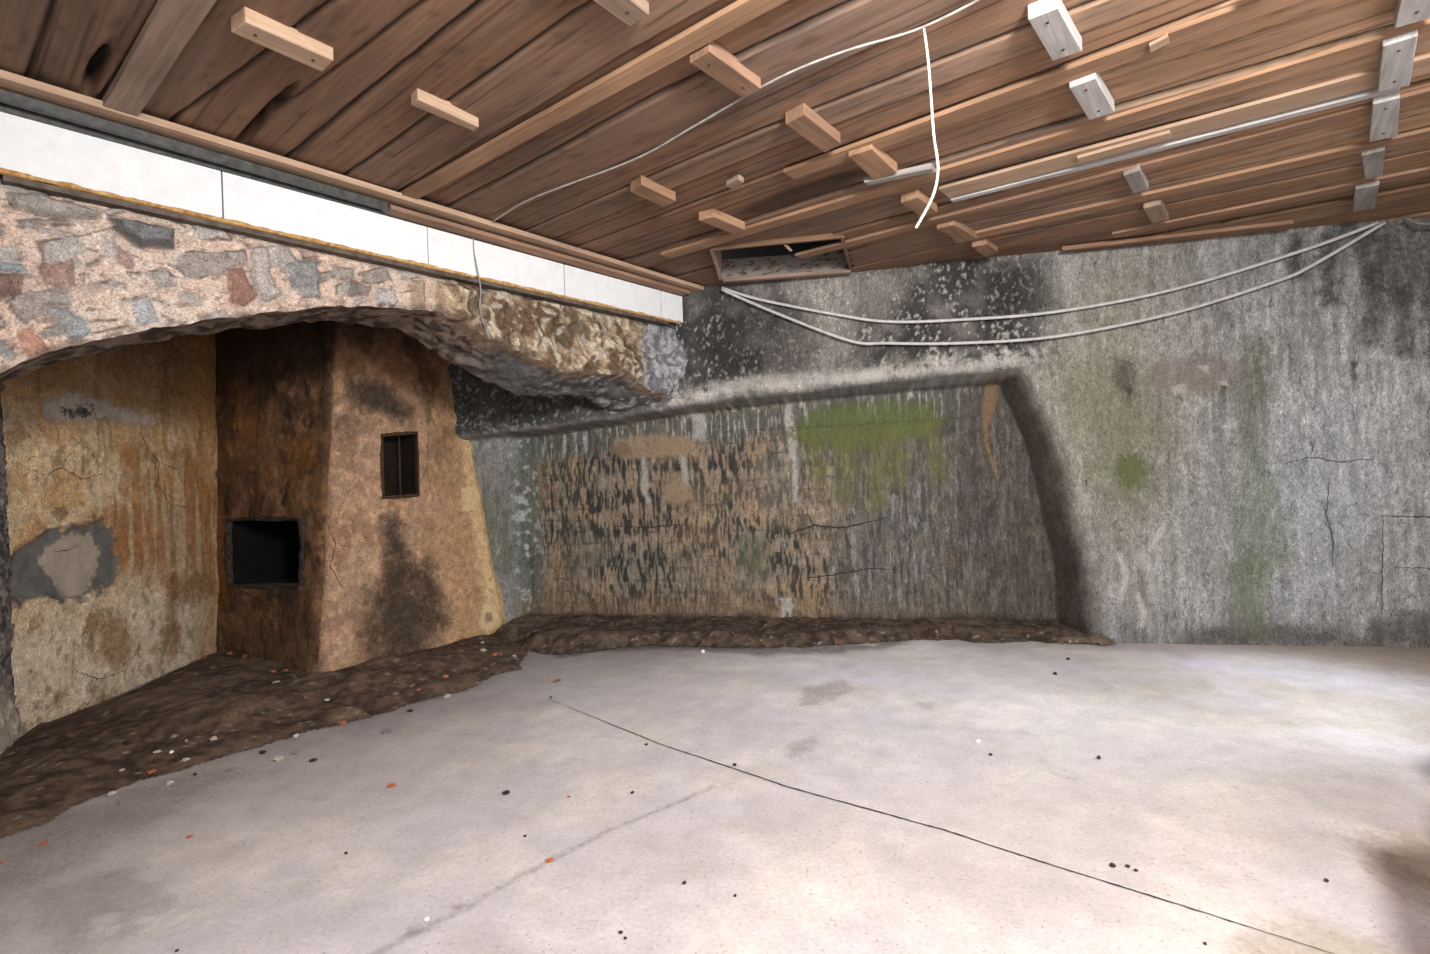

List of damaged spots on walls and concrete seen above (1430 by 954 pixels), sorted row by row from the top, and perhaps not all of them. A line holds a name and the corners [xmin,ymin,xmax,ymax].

damp [1285,234,1340,307]
damp [1361,263,1430,364]
damp [709,356,1032,511]
flaking render [7,516,120,608]
damp [384,531,443,623]